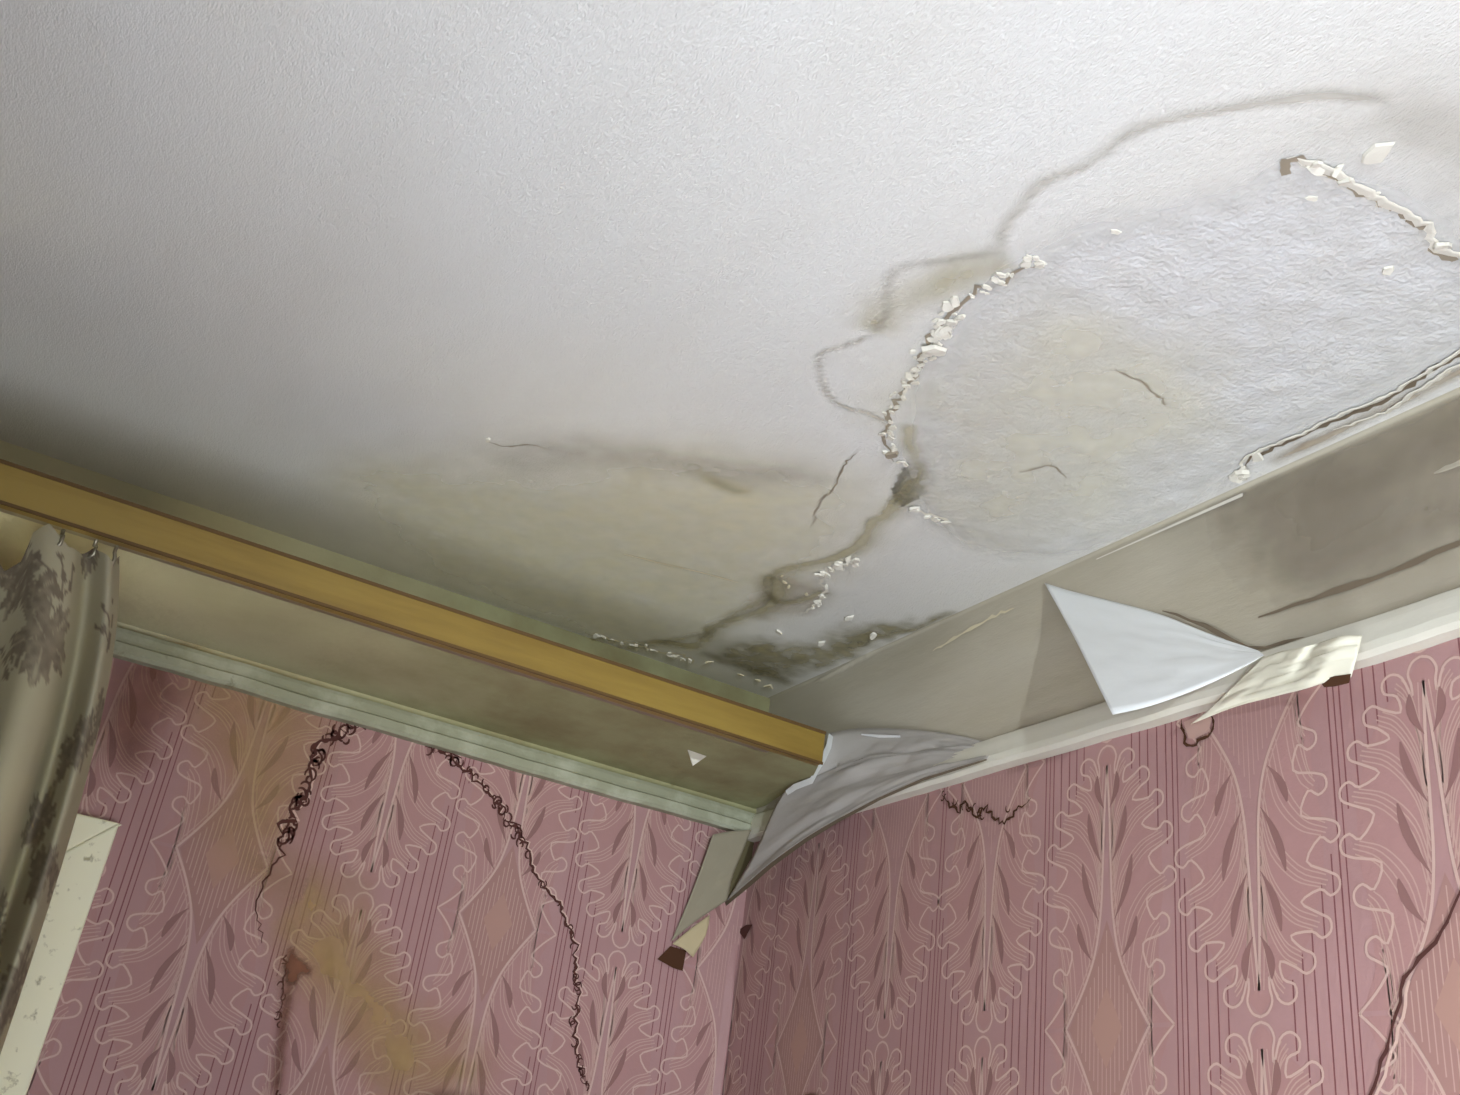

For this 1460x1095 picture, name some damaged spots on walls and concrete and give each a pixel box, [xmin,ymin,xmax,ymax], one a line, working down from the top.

peeling [1280,142,1460,262]
peeling [1228,452,1264,483]
leakage [1271,398,1460,554]
leakage [404,471,921,648]
peeling [593,633,713,664]
leakage [725,616,943,679]
peeling [688,750,706,766]
crack [941,790,1010,820]
crack [255,723,366,1028]
crack [425,746,591,1091]
peeling [672,830,754,957]
crack [1369,890,1460,1095]